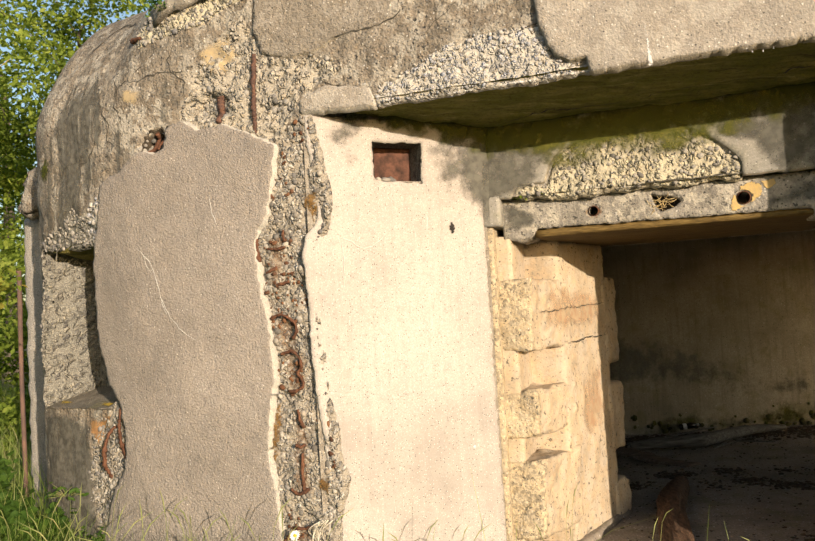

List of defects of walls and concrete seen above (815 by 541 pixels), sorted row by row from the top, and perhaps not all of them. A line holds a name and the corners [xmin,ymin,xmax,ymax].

spalling [136,0,240,49]
spalling [375,26,589,109]
rust [216,96,226,124]
rust [256,230,286,262]
spalling [179,17,351,541]
rust [270,313,305,393]
rust [91,407,126,479]
rust [272,403,282,468]
rust [290,443,310,496]